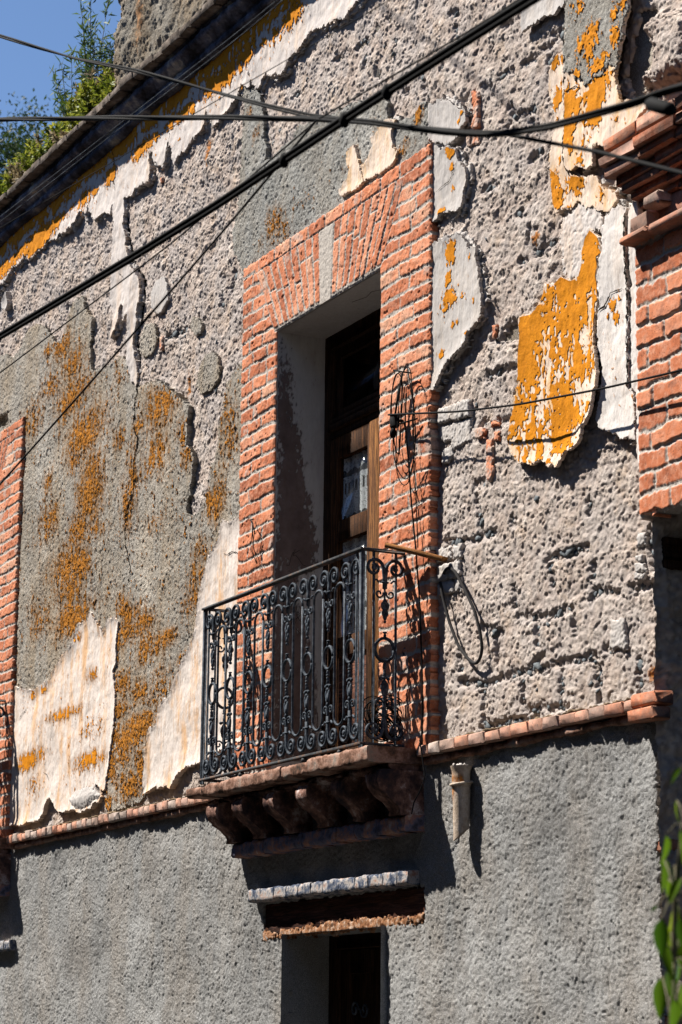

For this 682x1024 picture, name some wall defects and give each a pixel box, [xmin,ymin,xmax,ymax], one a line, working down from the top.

crack [112,152,147,594]
spalling [0,0,515,834]
spalling [338,0,682,741]